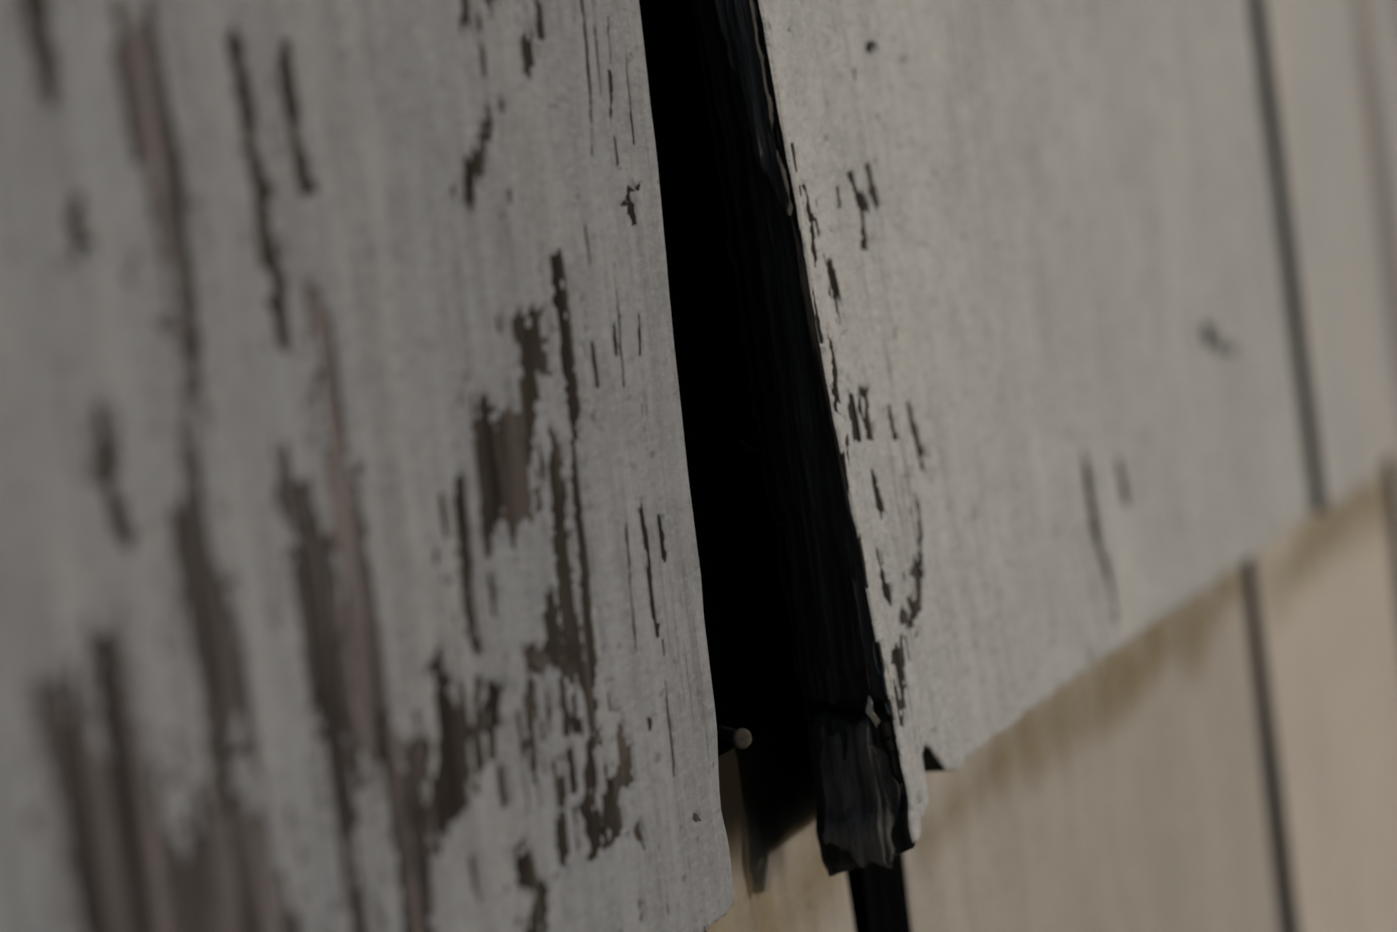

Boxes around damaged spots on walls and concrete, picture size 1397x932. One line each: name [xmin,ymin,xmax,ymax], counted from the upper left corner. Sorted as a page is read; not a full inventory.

peeling [514,0,545,81]
peeling [12,0,304,932]
peeling [222,22,645,932]
crack [614,263,643,418]
crack [790,143,842,415]
crack [842,452,869,589]
peeling [836,162,880,251]
peeling [843,384,873,467]
crack [594,683,613,825]
crack [625,503,675,777]
crack [810,641,904,812]
peeling [820,493,928,869]